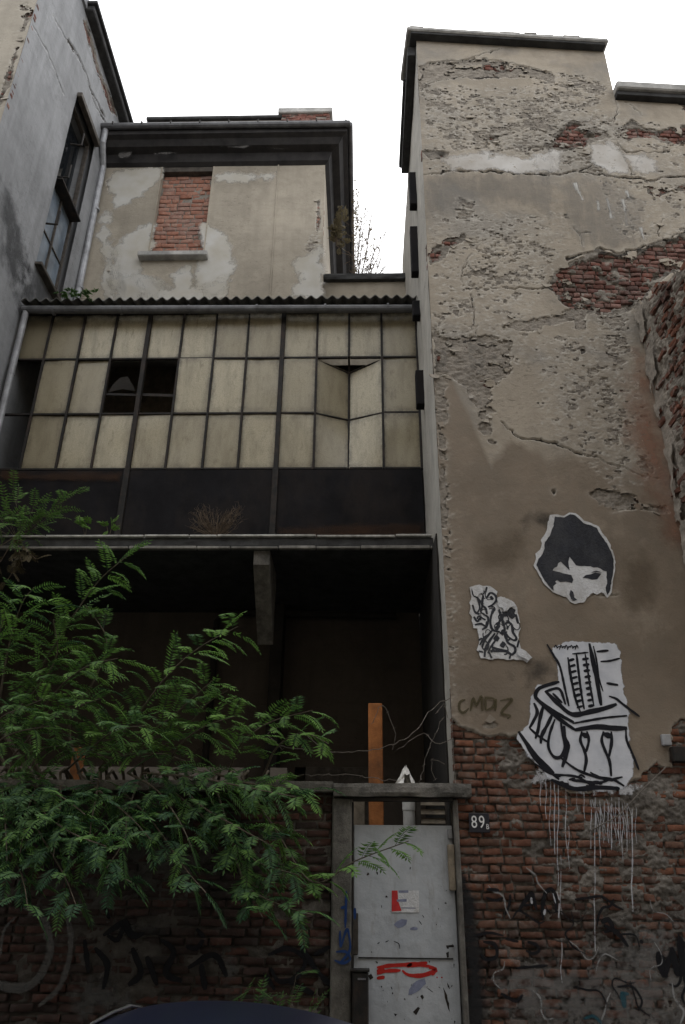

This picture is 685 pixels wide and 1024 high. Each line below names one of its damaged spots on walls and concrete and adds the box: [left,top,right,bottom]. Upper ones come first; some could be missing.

flaking render [0,4,39,109]
crack [67,39,105,120]
crack [431,149,685,181]
peeling [95,152,237,300]
peeling [291,200,325,298]
flaking render [418,56,685,581]
crack [501,422,611,465]